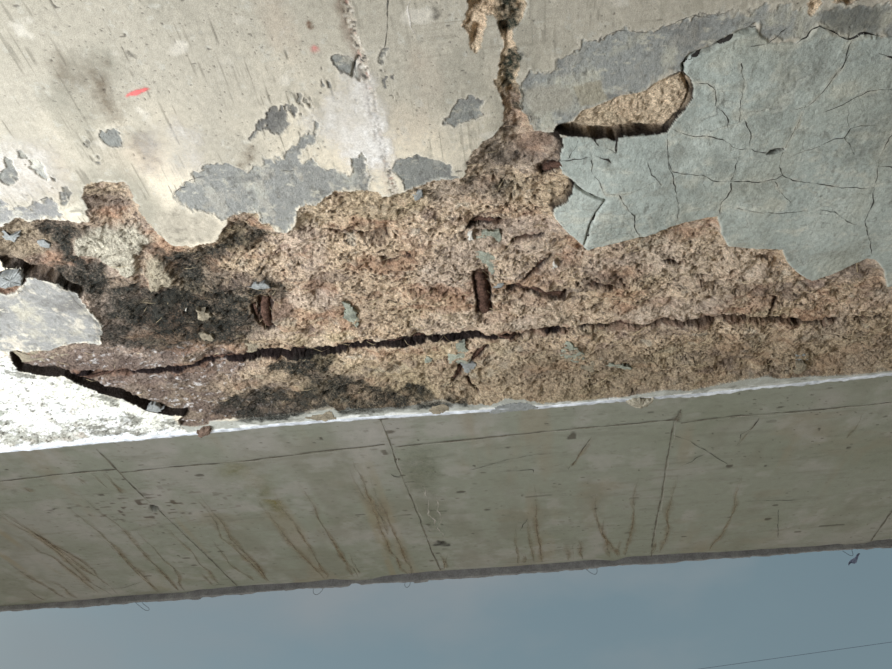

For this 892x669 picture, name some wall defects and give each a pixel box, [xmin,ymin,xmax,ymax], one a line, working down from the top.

damp [38,220,286,351]
spalling [0,0,892,438]
crack [559,26,892,254]